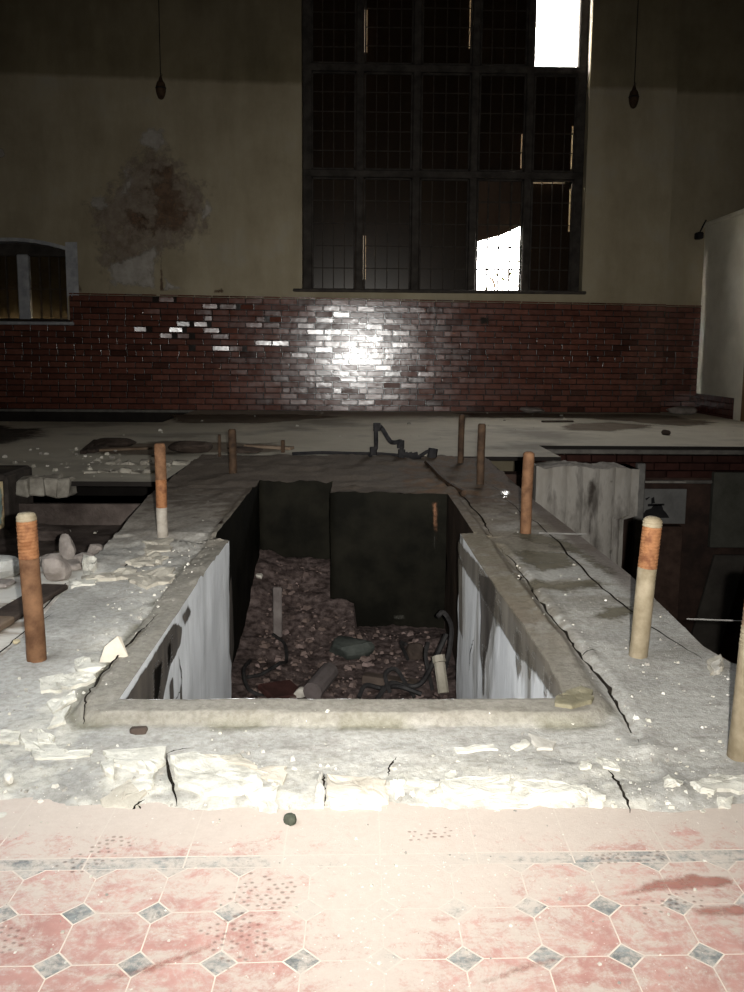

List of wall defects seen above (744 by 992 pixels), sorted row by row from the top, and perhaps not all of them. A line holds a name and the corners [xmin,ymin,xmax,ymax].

water stain [91,128,211,291]
crack [83,614,158,724]
spalling [0,656,287,814]
crack [166,748,186,805]
crack [453,479,639,742]
crack [608,770,631,811]